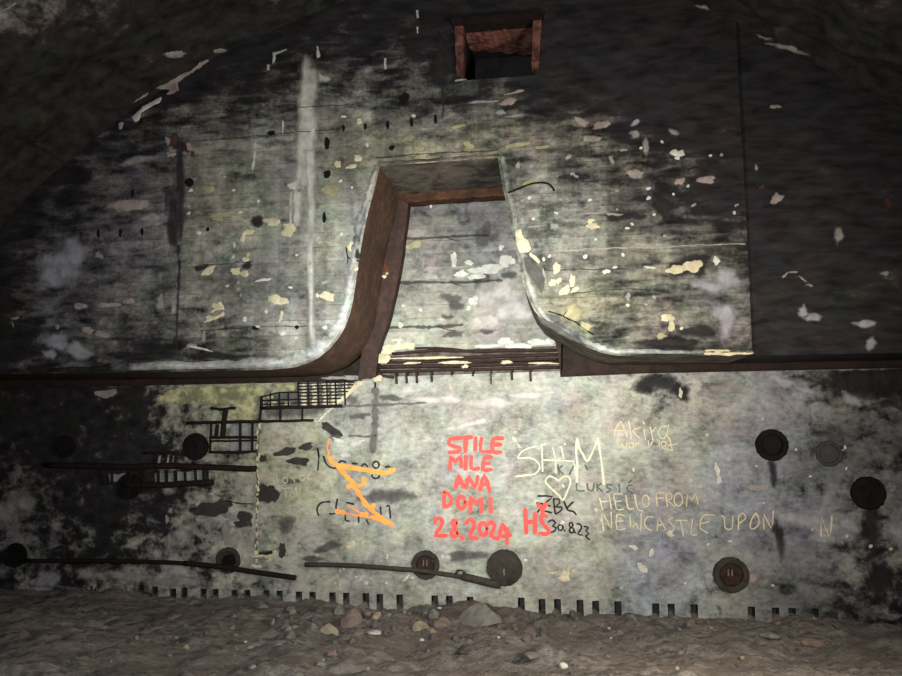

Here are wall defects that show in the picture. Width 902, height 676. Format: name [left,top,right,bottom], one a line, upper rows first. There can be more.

peeling [133,48,226,103]
water stain [289,46,330,344]
water stain [165,189,180,288]
flaking render [262,218,305,237]
flaking render [584,212,623,229]
flaking render [201,249,215,276]
flaking render [230,252,272,291]
flaking render [643,256,720,275]
flaking render [319,280,334,302]
flaking render [268,294,299,336]
flaking render [657,314,684,339]
spalling [378,339,471,368]